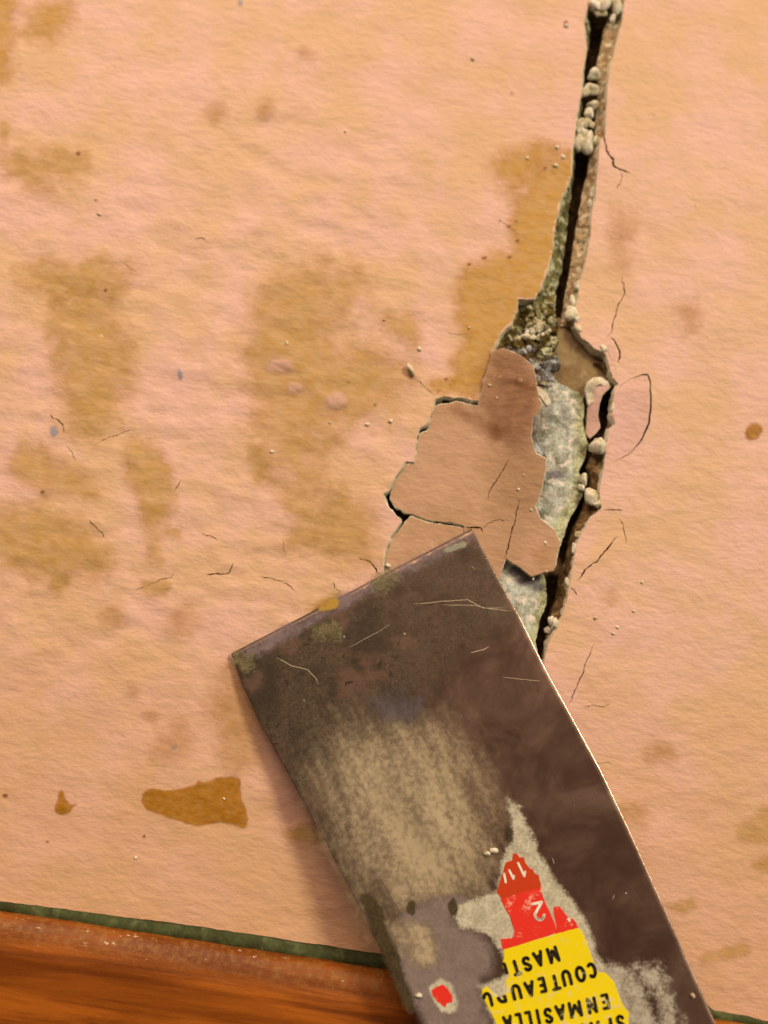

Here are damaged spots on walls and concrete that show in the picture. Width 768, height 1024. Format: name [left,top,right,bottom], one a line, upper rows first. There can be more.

leakage [431,144,571,392]
leakage [30,259,129,434]
peeling [383,0,652,664]
crack [532,0,630,660]
leakage [247,272,396,553]
crack [411,377,478,406]
leakage [127,442,172,526]
leakage [0,512,105,589]
crack [359,494,461,574]
leakage [55,791,74,814]
leakage [142,777,248,828]